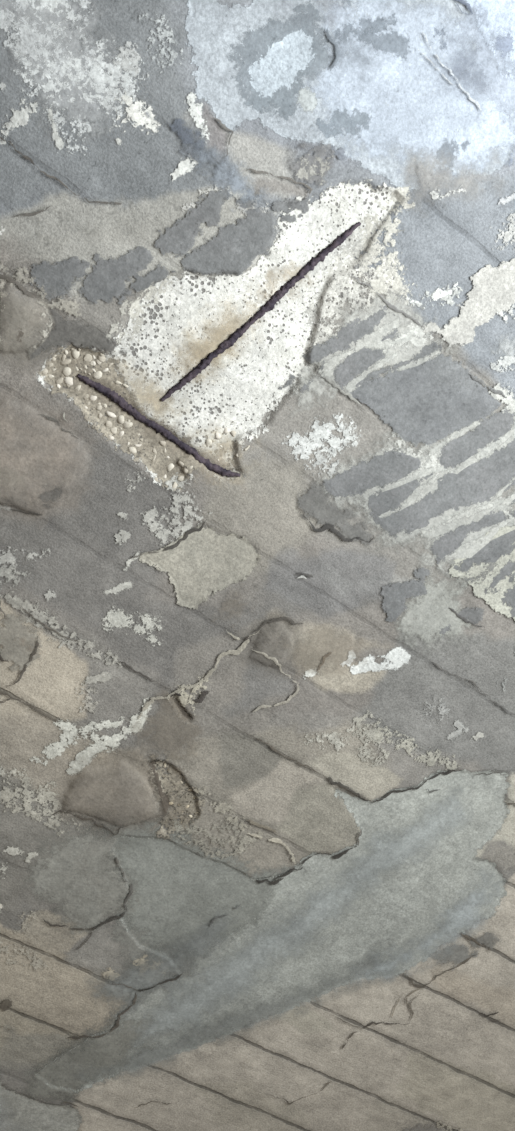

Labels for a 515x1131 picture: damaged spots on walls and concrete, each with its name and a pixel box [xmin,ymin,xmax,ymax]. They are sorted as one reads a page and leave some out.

water stain [429,185,466,200]
water stain [490,191,515,250]
spalling [0,0,515,647]
water stain [318,282,463,393]
water stain [488,336,515,414]
water stain [282,414,362,478]
water stain [379,421,515,518]
water stain [419,477,515,560]
crack [450,608,484,627]
crack [118,616,515,805]
peeling [0,754,511,1131]
water stain [97,799,500,1074]